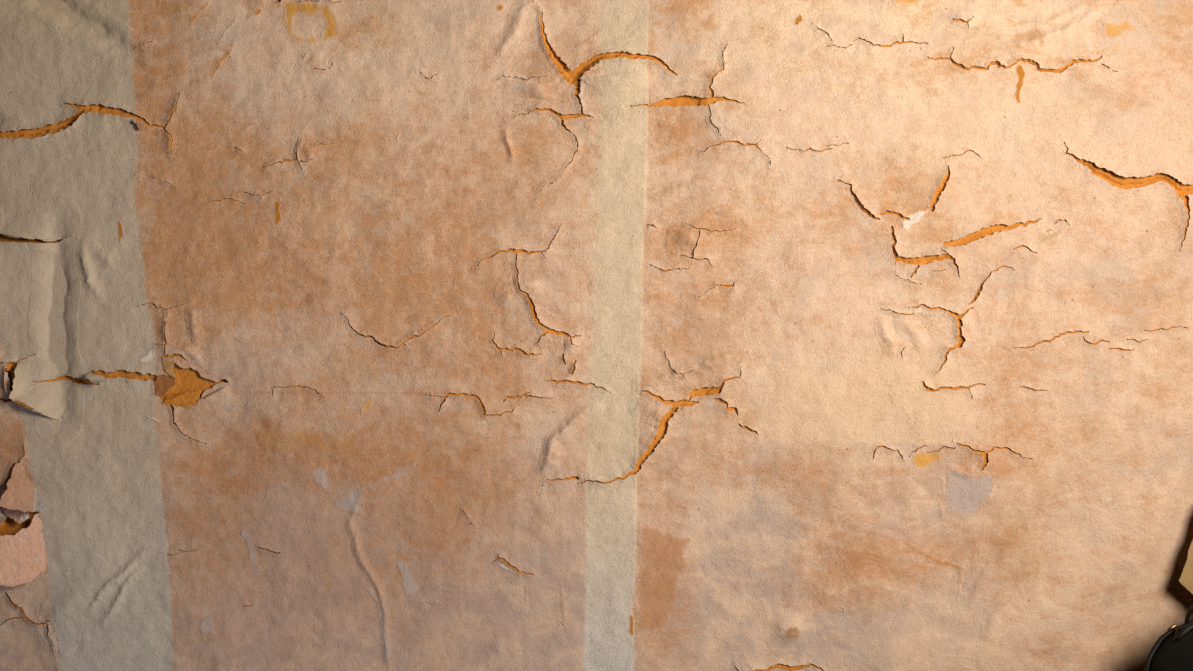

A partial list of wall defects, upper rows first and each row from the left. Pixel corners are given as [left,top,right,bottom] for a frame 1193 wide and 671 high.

crack [271,0,345,8]
crack [297,49,336,74]
crack [0,86,338,207]
crack [1060,137,1193,257]
crack [0,230,75,248]
crack [421,0,1122,495]
crack [1008,322,1193,355]
crack [268,381,329,403]
crack [0,298,233,536]
peeling [0,462,51,587]
crack [727,658,827,671]